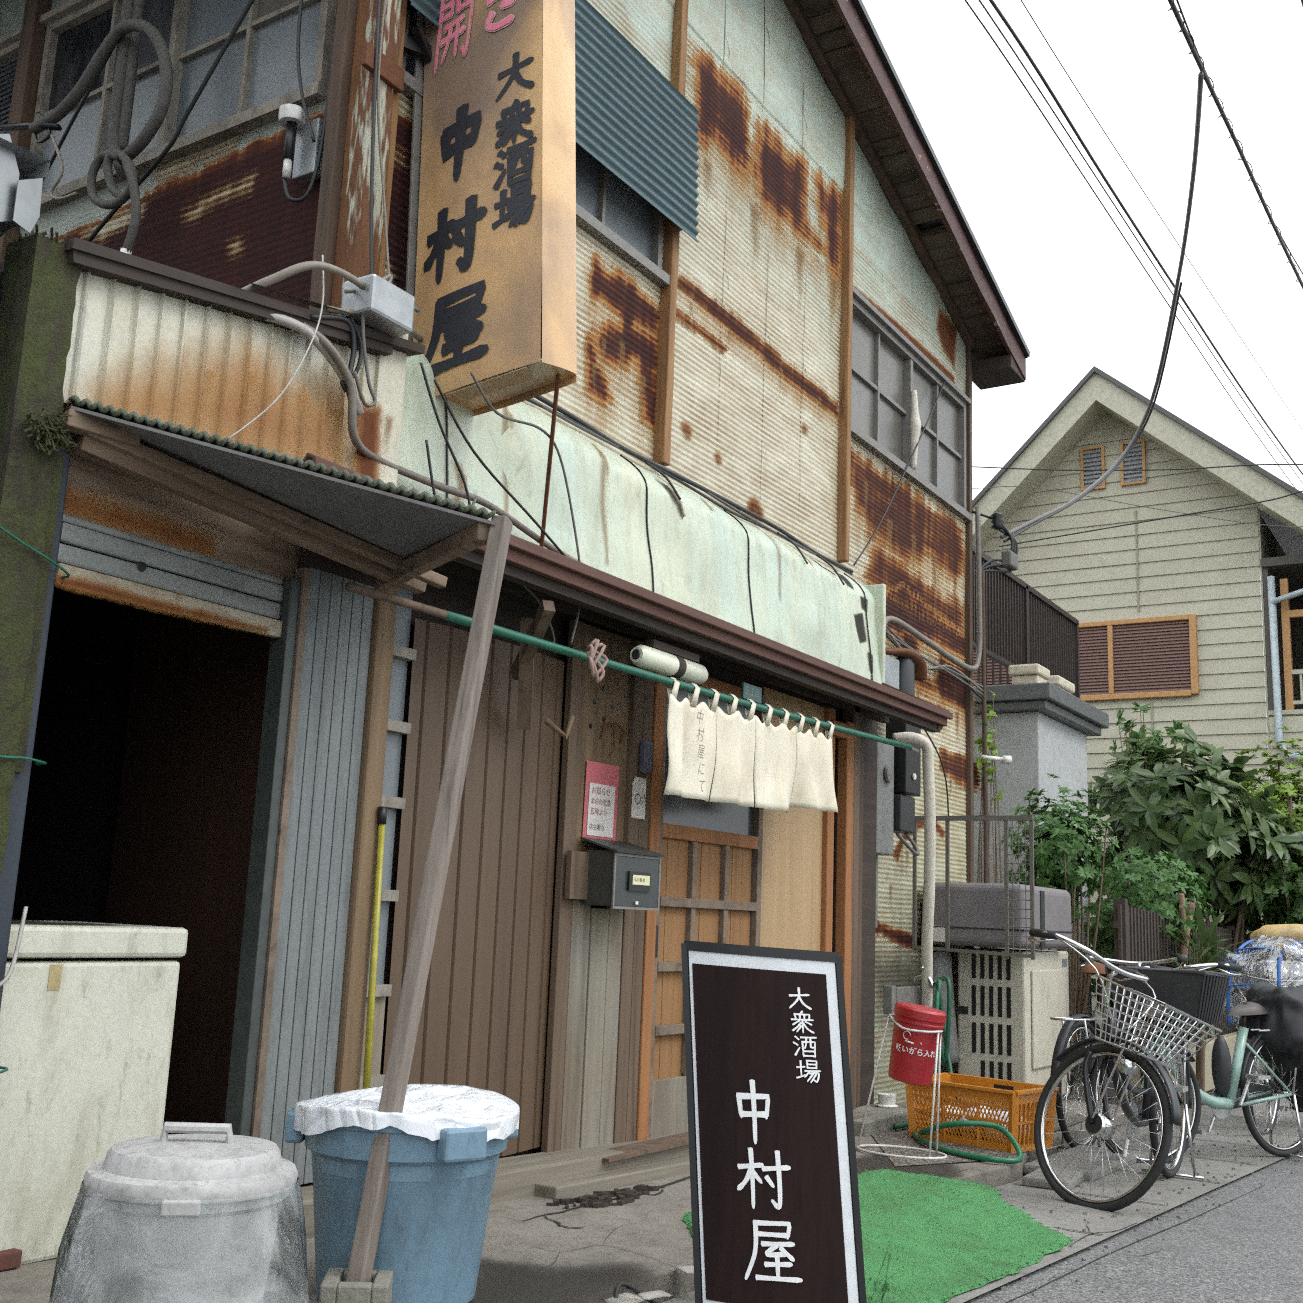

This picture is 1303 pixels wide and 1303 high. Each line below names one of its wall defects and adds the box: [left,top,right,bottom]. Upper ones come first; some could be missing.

rust [53,128,321,309]
rust [687,40,957,384]
rust [93,352,392,480]
rust [584,252,660,430]
rust [681,422,692,439]
rust [676,275,839,423]
rust [850,446,966,730]